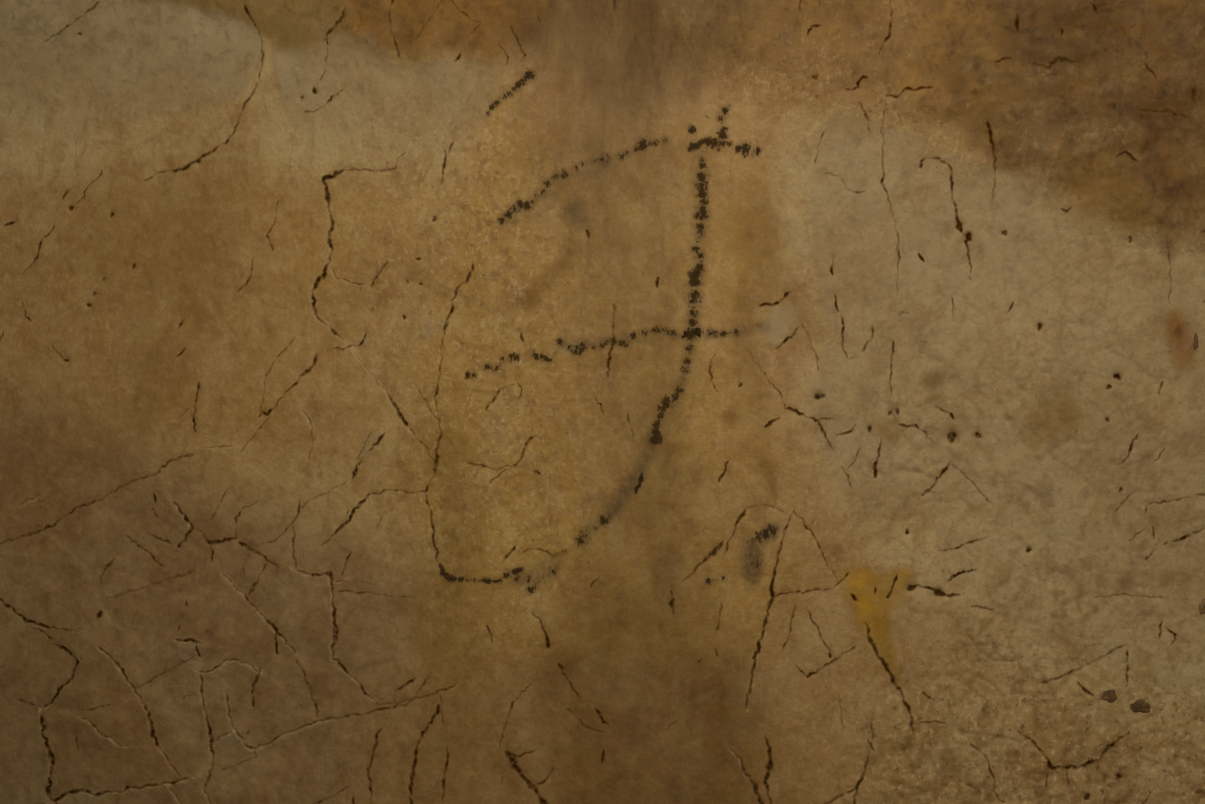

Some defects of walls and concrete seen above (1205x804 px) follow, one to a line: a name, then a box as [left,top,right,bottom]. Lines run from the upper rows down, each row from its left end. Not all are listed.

crack [174,51,264,172]
crack [920,157,970,259]
crack [259,168,385,428]
crack [443,264,474,333]
crack [694,512,745,571]
crack [0,382,452,804]
crack [746,525,991,726]
crack [540,620,607,762]
crack [502,735,548,804]
crack [742,739,773,804]
crack [830,746,873,804]